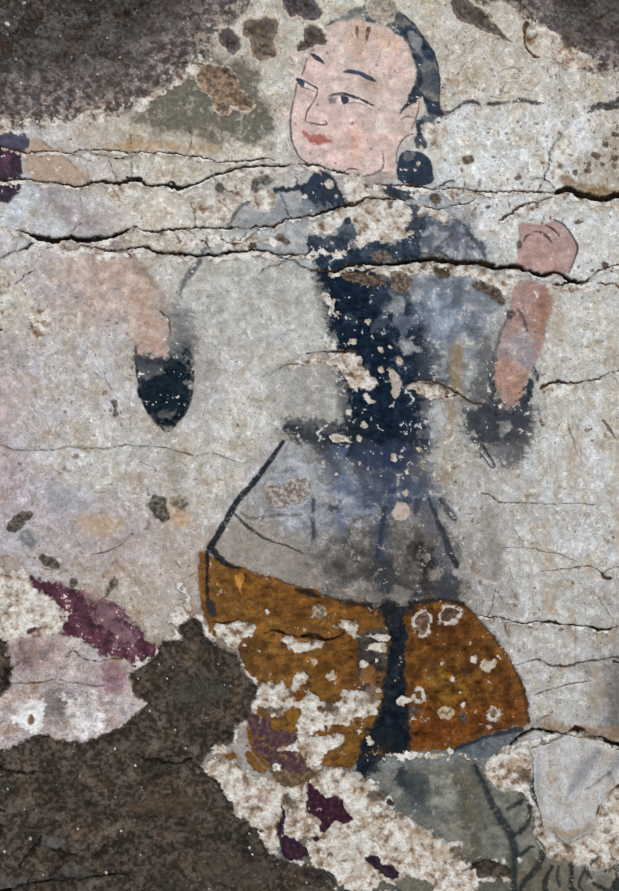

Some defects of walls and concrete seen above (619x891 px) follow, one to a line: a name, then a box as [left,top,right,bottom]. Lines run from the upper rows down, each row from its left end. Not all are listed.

flaking render [0,0,330,136]
spalling [355,0,401,42]
flaking render [445,0,619,82]
crack [0,126,619,291]
crack [0,271,34,307]
crack [538,369,619,392]
peeling [391,488,412,522]
flaking render [0,565,524,891]
crack [477,588,619,755]
flaking render [382,730,619,867]